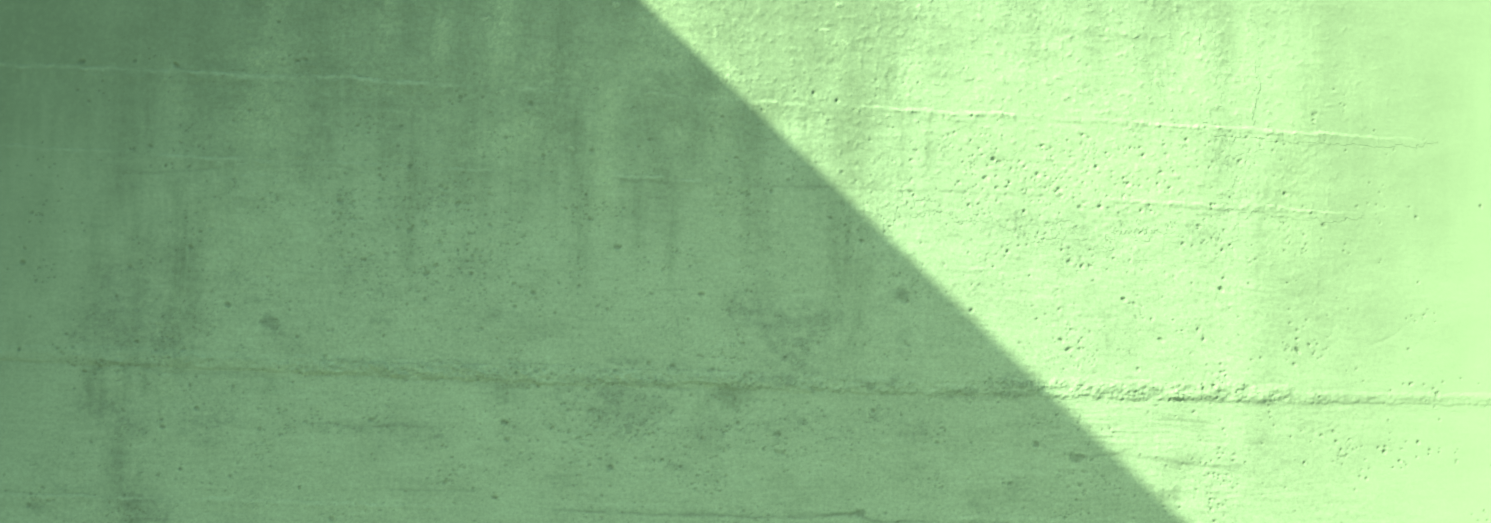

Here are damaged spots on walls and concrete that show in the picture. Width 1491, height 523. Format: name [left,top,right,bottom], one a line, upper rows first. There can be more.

water stain [656,16,674,27]
water stain [724,63,741,87]
water stain [1040,220,1124,273]
water stain [251,350,622,411]
water stain [538,347,686,451]
water stain [947,303,1181,407]
water stain [1151,452,1203,508]